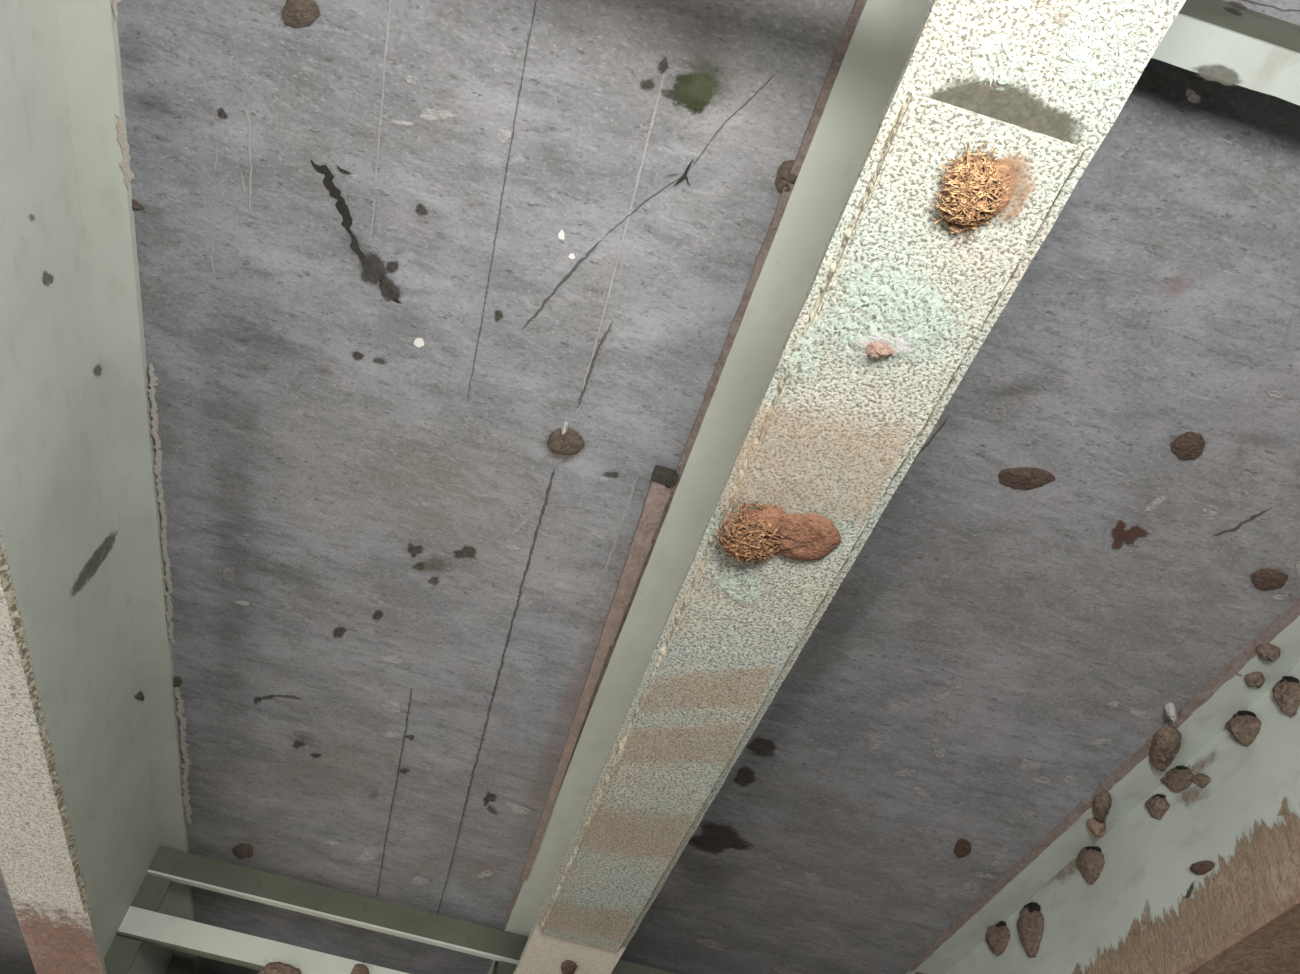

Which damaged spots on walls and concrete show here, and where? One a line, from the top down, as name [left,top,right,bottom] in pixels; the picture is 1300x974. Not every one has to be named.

crack [466,0,537,404]
crack [521,71,778,330]
crack [577,320,614,408]
crack [437,469,555,914]
corrosion [14,904,102,974]
corrosion [1073,798,1300,974]
peeling [1185,861,1215,898]